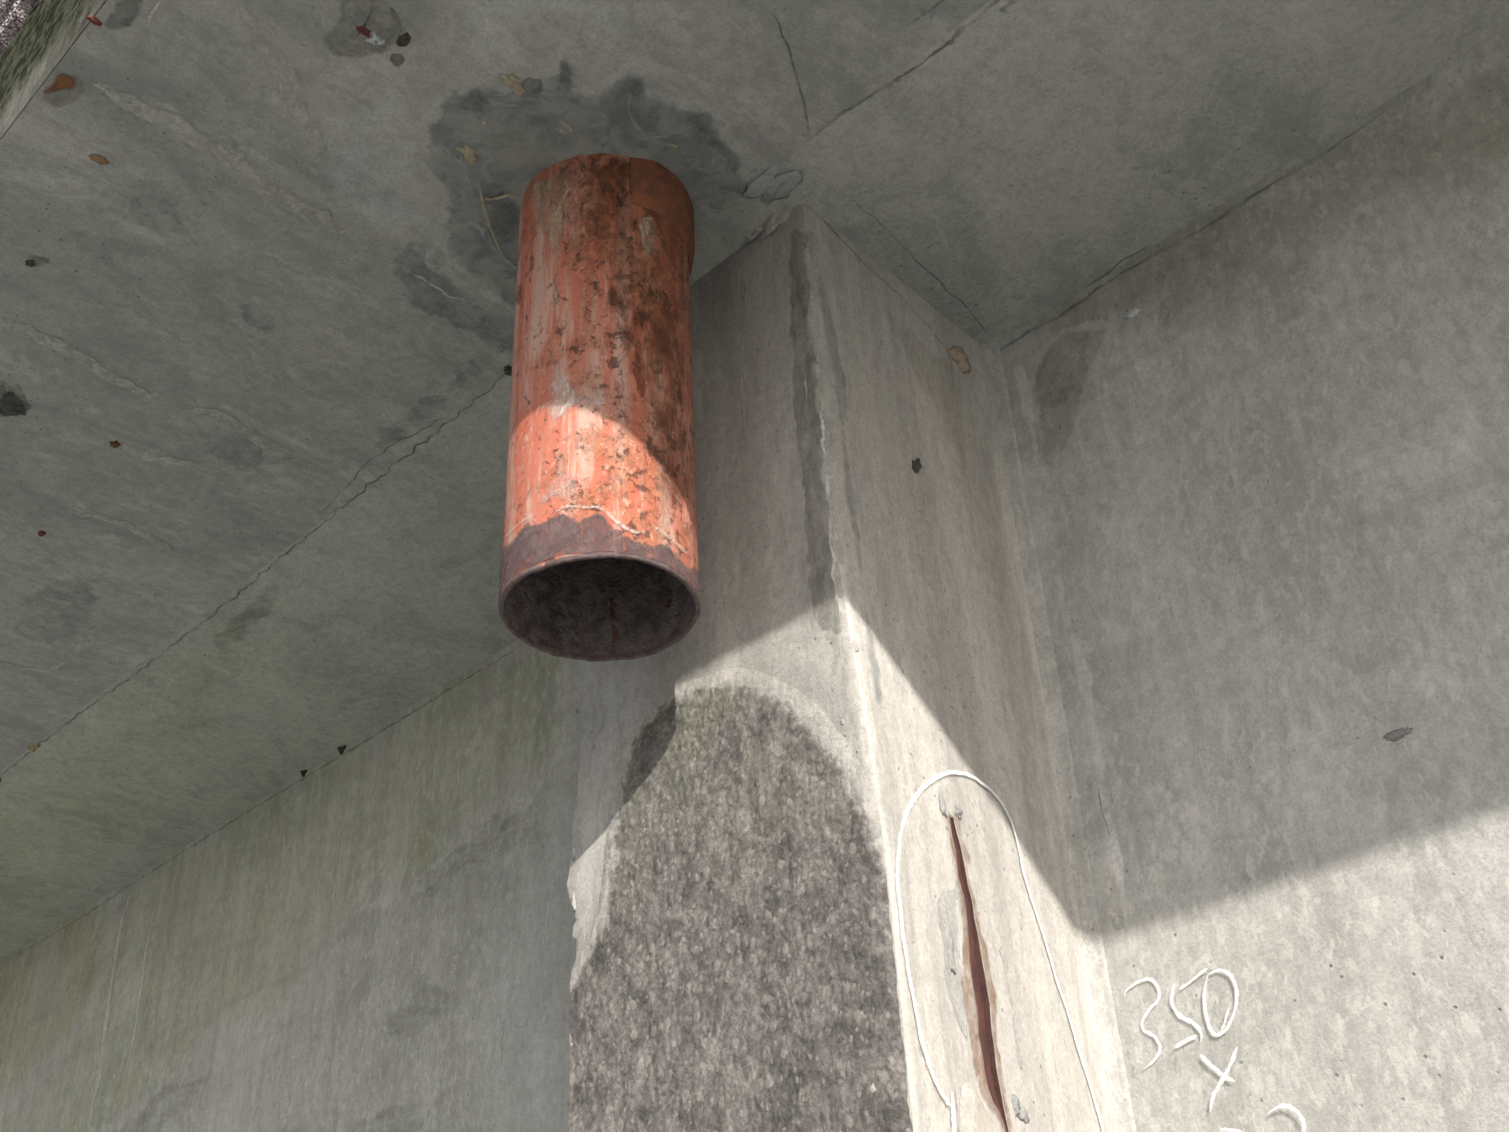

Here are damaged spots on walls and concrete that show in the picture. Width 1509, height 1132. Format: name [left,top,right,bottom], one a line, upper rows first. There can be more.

spalling [0,374,39,424]
crack [353,391,489,500]
crack [938,792,1030,1132]